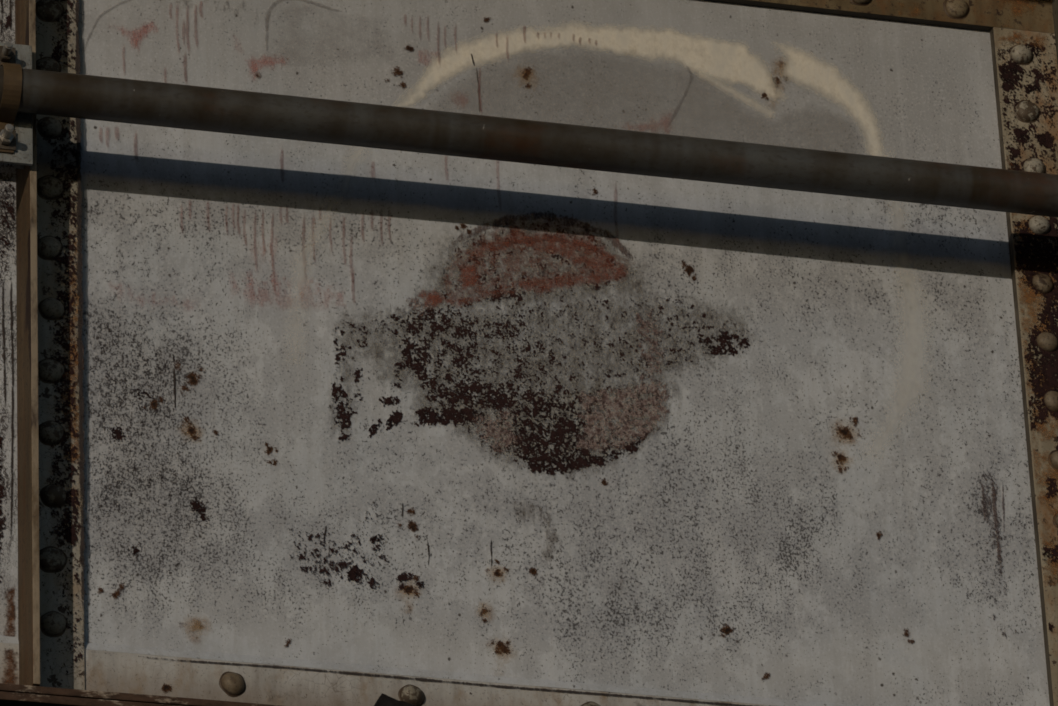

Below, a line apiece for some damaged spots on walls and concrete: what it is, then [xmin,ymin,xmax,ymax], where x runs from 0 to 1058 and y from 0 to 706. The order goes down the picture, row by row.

corrosion [682,261,696,281]
corrosion [836,417,863,442]
corrosion [397,507,420,539]
corrosion [403,575,420,598]